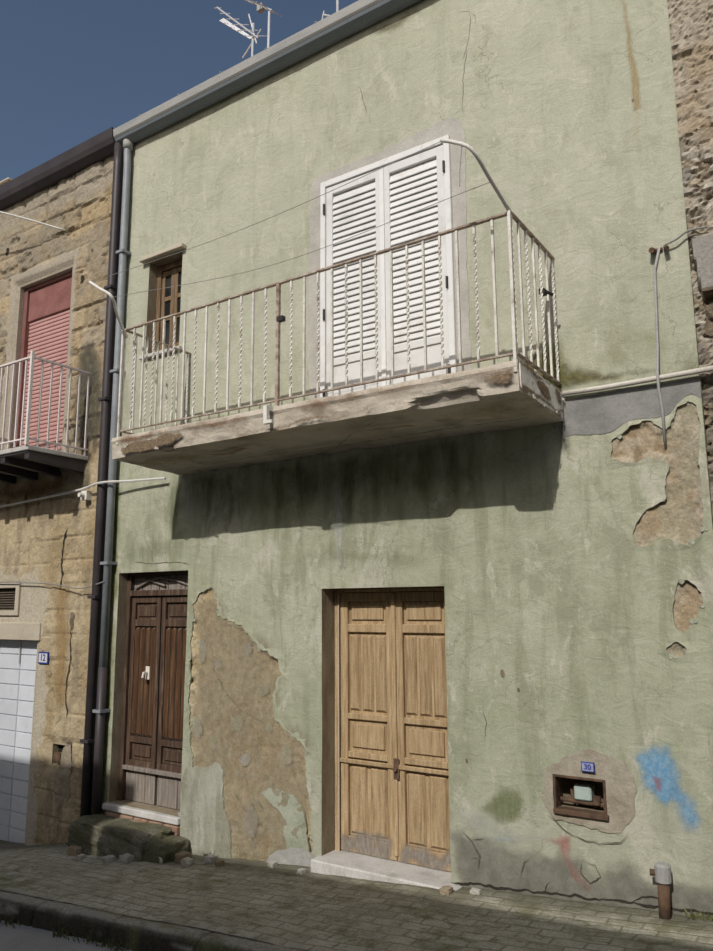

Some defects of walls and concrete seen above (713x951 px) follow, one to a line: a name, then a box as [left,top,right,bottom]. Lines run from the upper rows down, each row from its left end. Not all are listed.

crack [460,11,476,110]
corrosion [628,40,638,109]
peeling [485,361,566,418]
peeling [611,402,708,547]
peeling [666,578,705,659]
crack [65,629,73,717]
peeling [189,587,313,861]